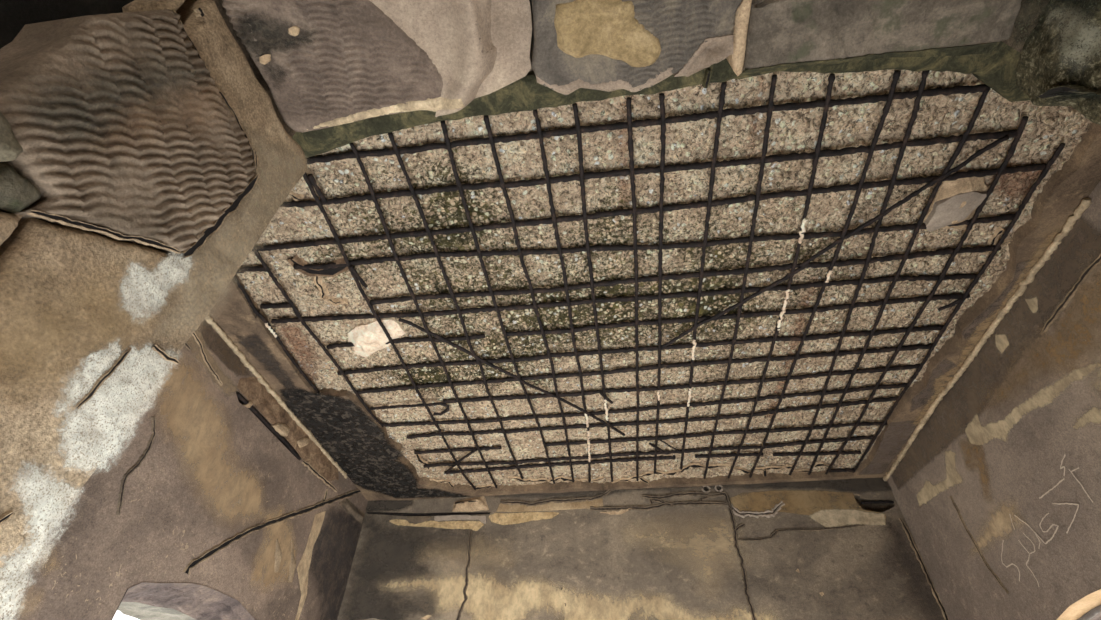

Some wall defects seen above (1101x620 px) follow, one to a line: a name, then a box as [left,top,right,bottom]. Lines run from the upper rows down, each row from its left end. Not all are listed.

spalling [236,33,1093,486]
crack [73,332,223,410]
crack [116,417,156,515]
crack [183,459,361,575]
peeling [367,498,631,531]
crack [416,454,865,620]
spalling [854,495,895,512]
crack [899,518,949,620]
peeling [917,362,1101,506]